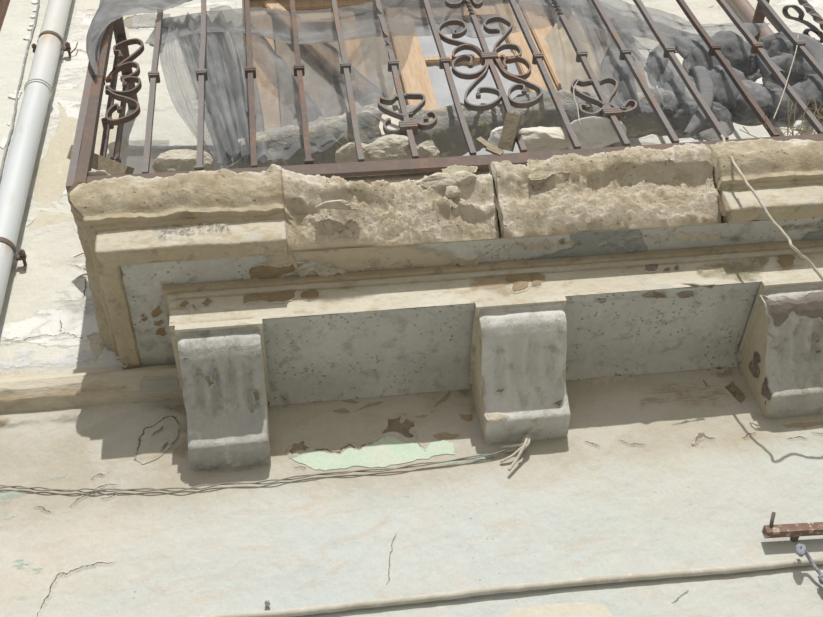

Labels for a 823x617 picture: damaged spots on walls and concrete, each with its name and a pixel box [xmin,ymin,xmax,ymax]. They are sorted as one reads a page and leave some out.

flaking render [94,107,139,159]
flaking render [18,99,79,240]
crack [488,164,505,231]
crack [73,264,88,300]
spalling [140,304,168,336]
spalling [760,291,823,329]
spalling [749,350,773,406]
peeling [285,413,455,471]
crack [386,533,397,584]
crack [35,560,115,617]